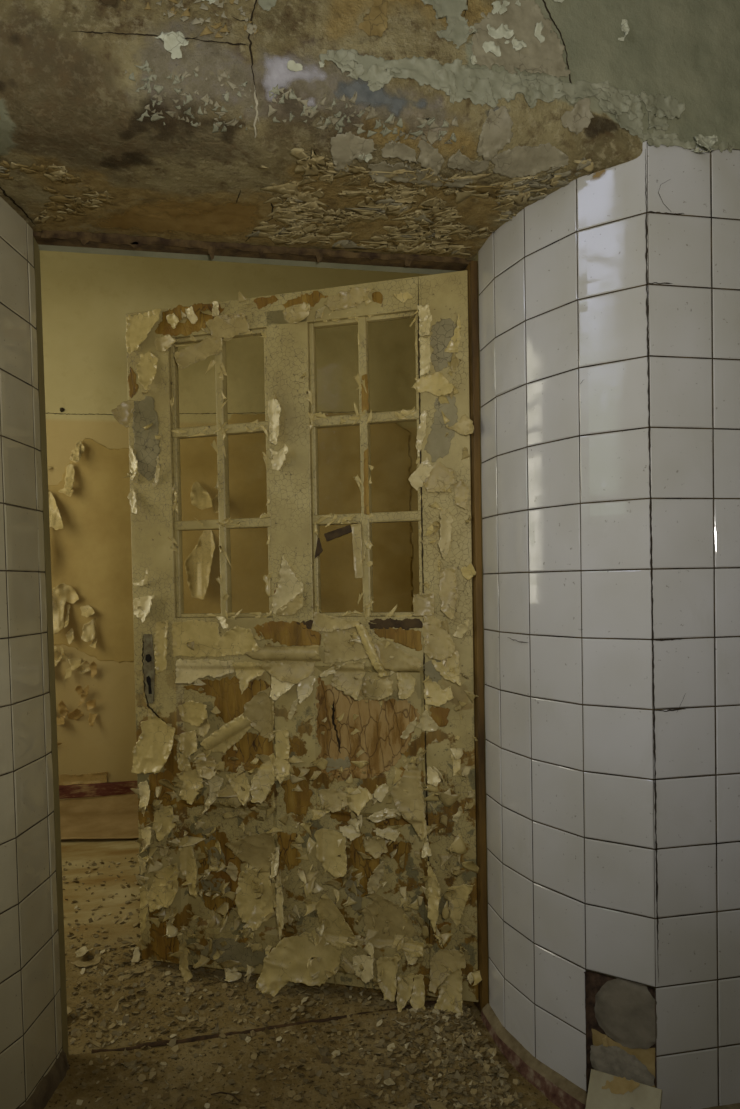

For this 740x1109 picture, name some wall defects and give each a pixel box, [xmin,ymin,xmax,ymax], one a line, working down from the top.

crack [74,29,157,37]
leakage [124,101,189,137]
flaking render [124,60,254,133]
flaking render [144,0,277,60]
crack [185,0,259,138]
peeling [245,0,686,256]
crack [542,0,572,84]
peeling [111,303,249,428]
flaking render [48,438,134,726]
flaking render [124,413,461,997]
peeling [376,861,475,1013]
peeling [584,971,657,1093]